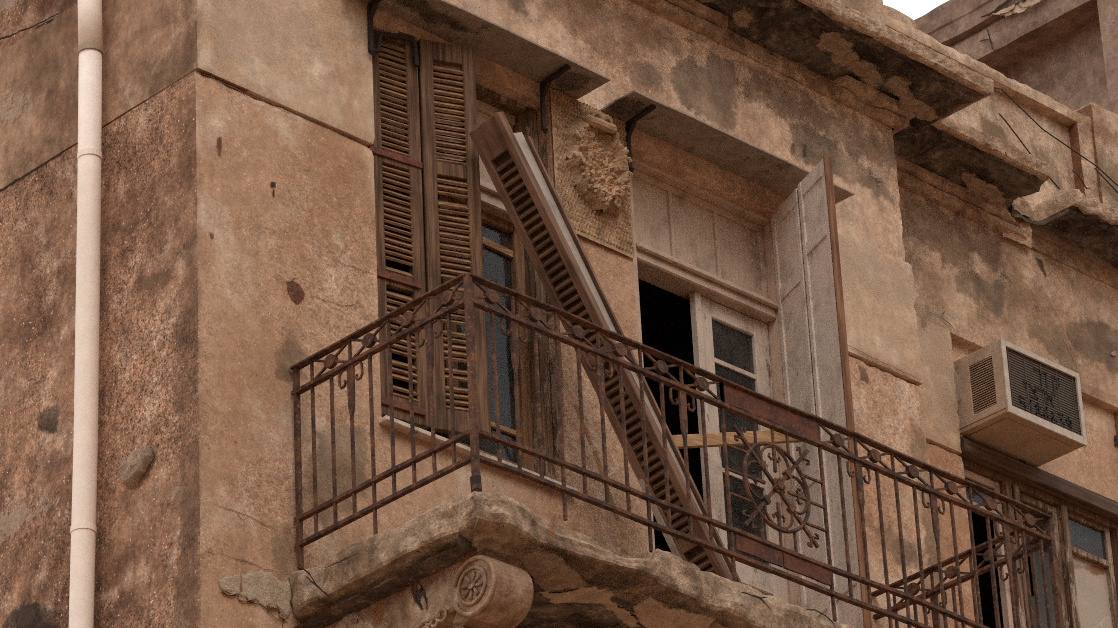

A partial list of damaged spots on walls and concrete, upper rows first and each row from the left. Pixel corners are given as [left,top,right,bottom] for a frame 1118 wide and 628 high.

water stain [649,53,739,123]
flaking render [817,32,940,122]
flaking render [219,571,292,624]
flaking render [521,552,726,628]